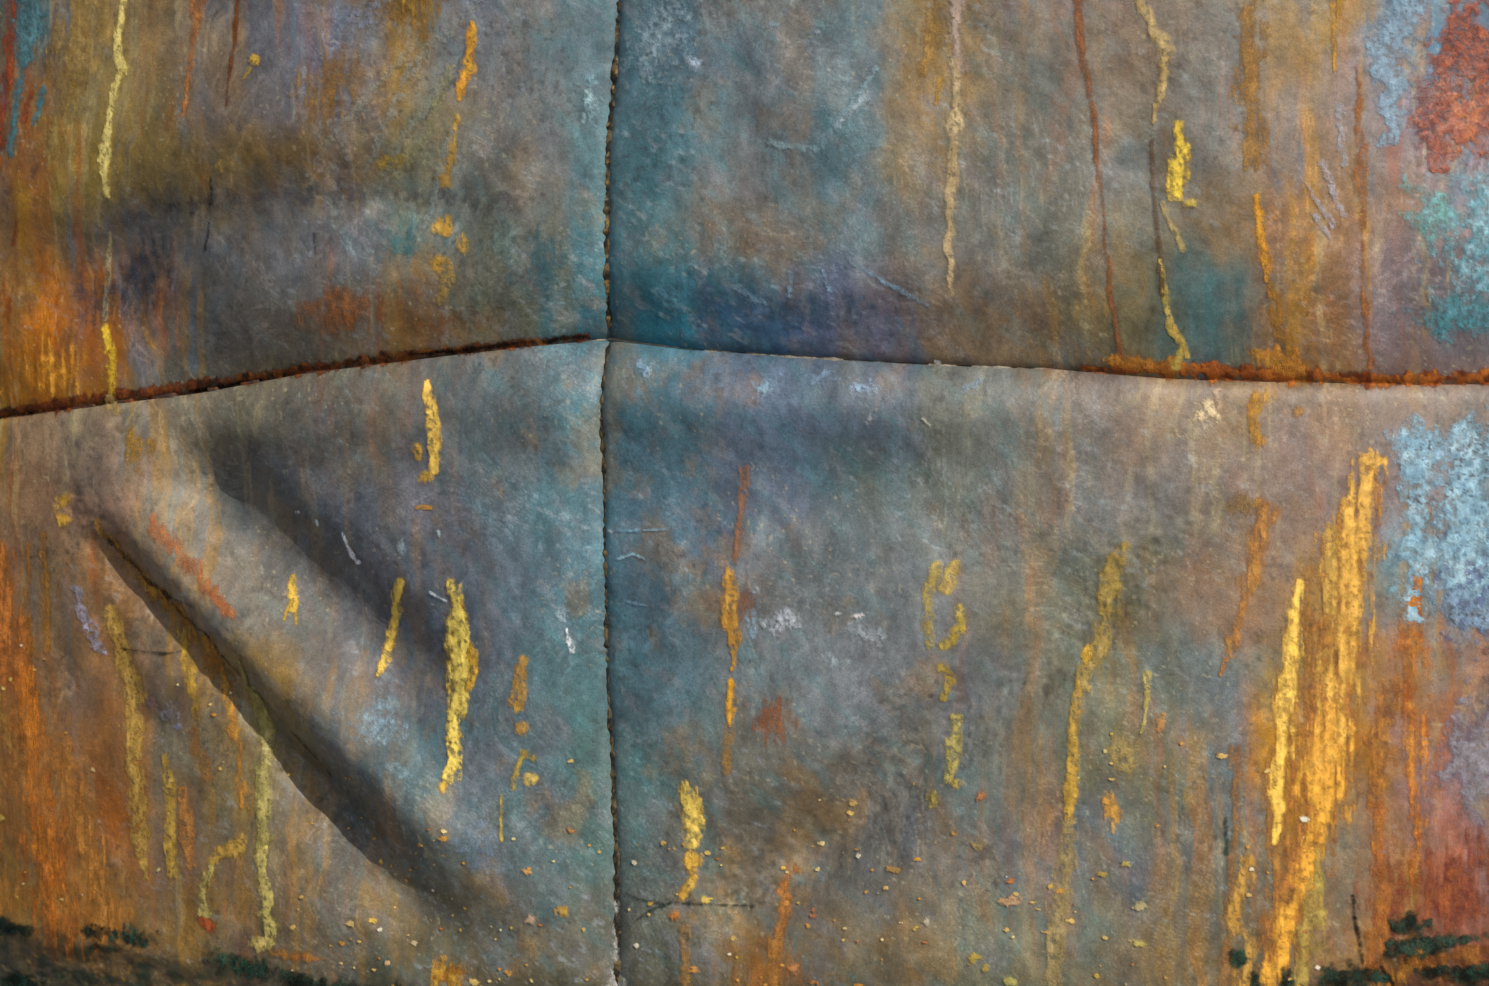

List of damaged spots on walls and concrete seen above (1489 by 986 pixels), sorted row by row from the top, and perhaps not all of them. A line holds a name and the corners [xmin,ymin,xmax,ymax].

rust [0,0,34,167]
rust [1074,0,1489,449]
rust [0,315,591,418]
rust [0,533,133,959]
rust [94,513,249,810]
rust [270,949,318,962]
rust [1219,746,1243,986]
rust [1219,493,1280,676]
rust [1255,465,1489,986]